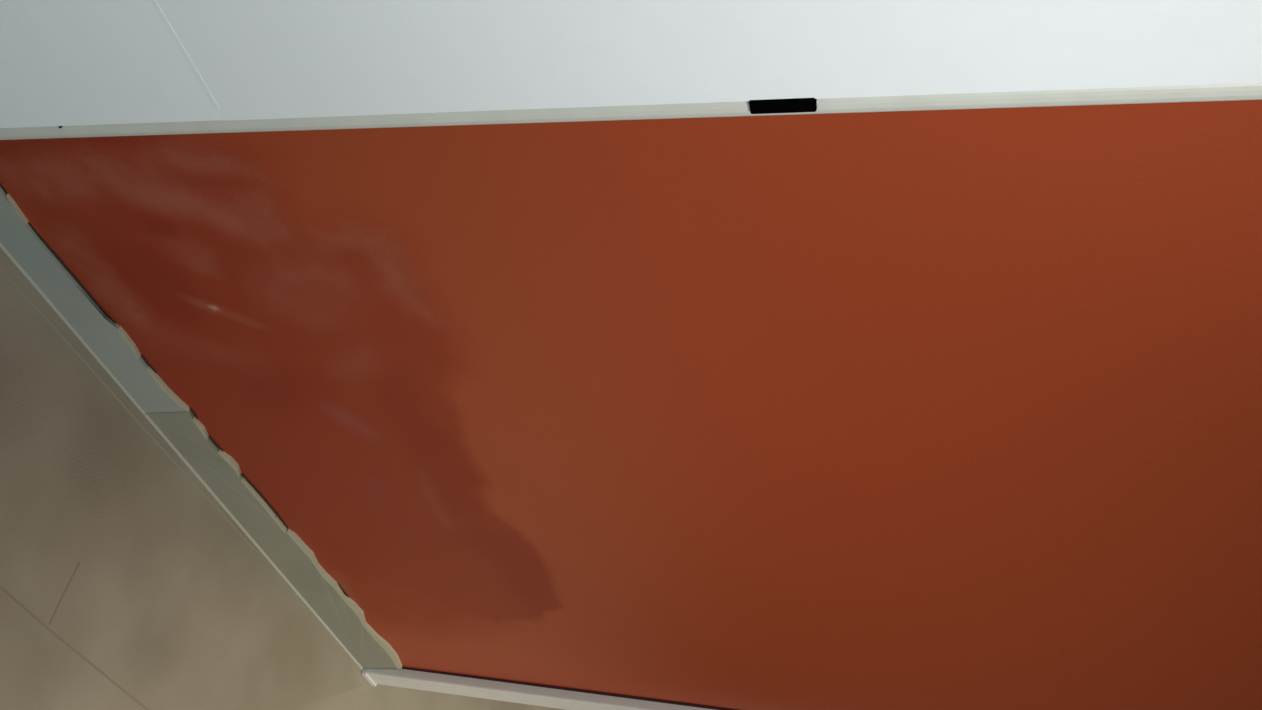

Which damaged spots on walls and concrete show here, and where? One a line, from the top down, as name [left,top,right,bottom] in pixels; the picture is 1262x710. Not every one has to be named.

water stain [0,0,612,646]